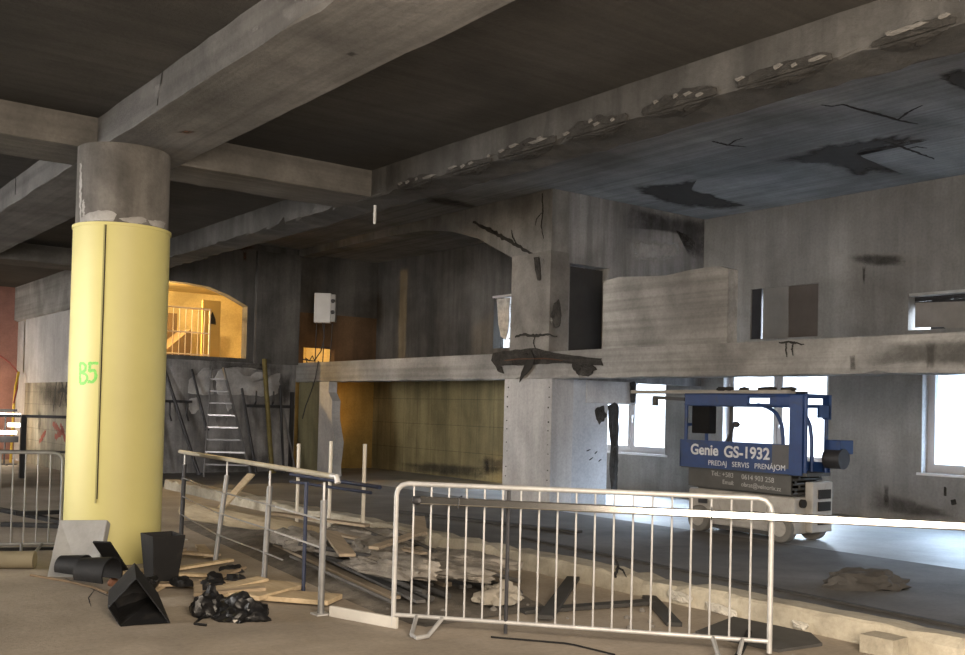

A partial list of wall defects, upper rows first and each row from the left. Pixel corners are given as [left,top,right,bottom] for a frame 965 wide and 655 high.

peeling [942,69,965,90]
crack [822,104,934,159]
peeling [789,136,923,175]
peeling [639,181,743,208]
peeling [80,210,165,228]
crack [473,193,544,254]